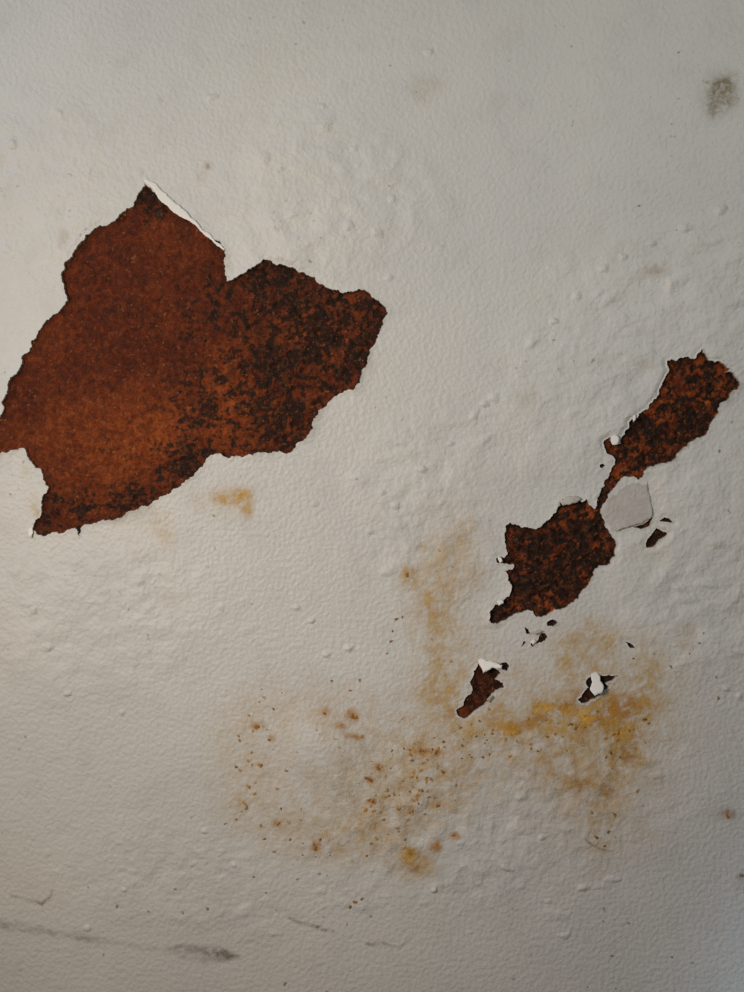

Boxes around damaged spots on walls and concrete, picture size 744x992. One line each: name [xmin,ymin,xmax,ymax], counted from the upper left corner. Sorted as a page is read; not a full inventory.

peeling [0,179,388,538]
peeling [489,349,740,647]
peeling [456,658,509,719]
rust [452,673,656,765]
peeling [578,672,619,704]
rust [364,737,445,821]
rust [371,828,428,872]